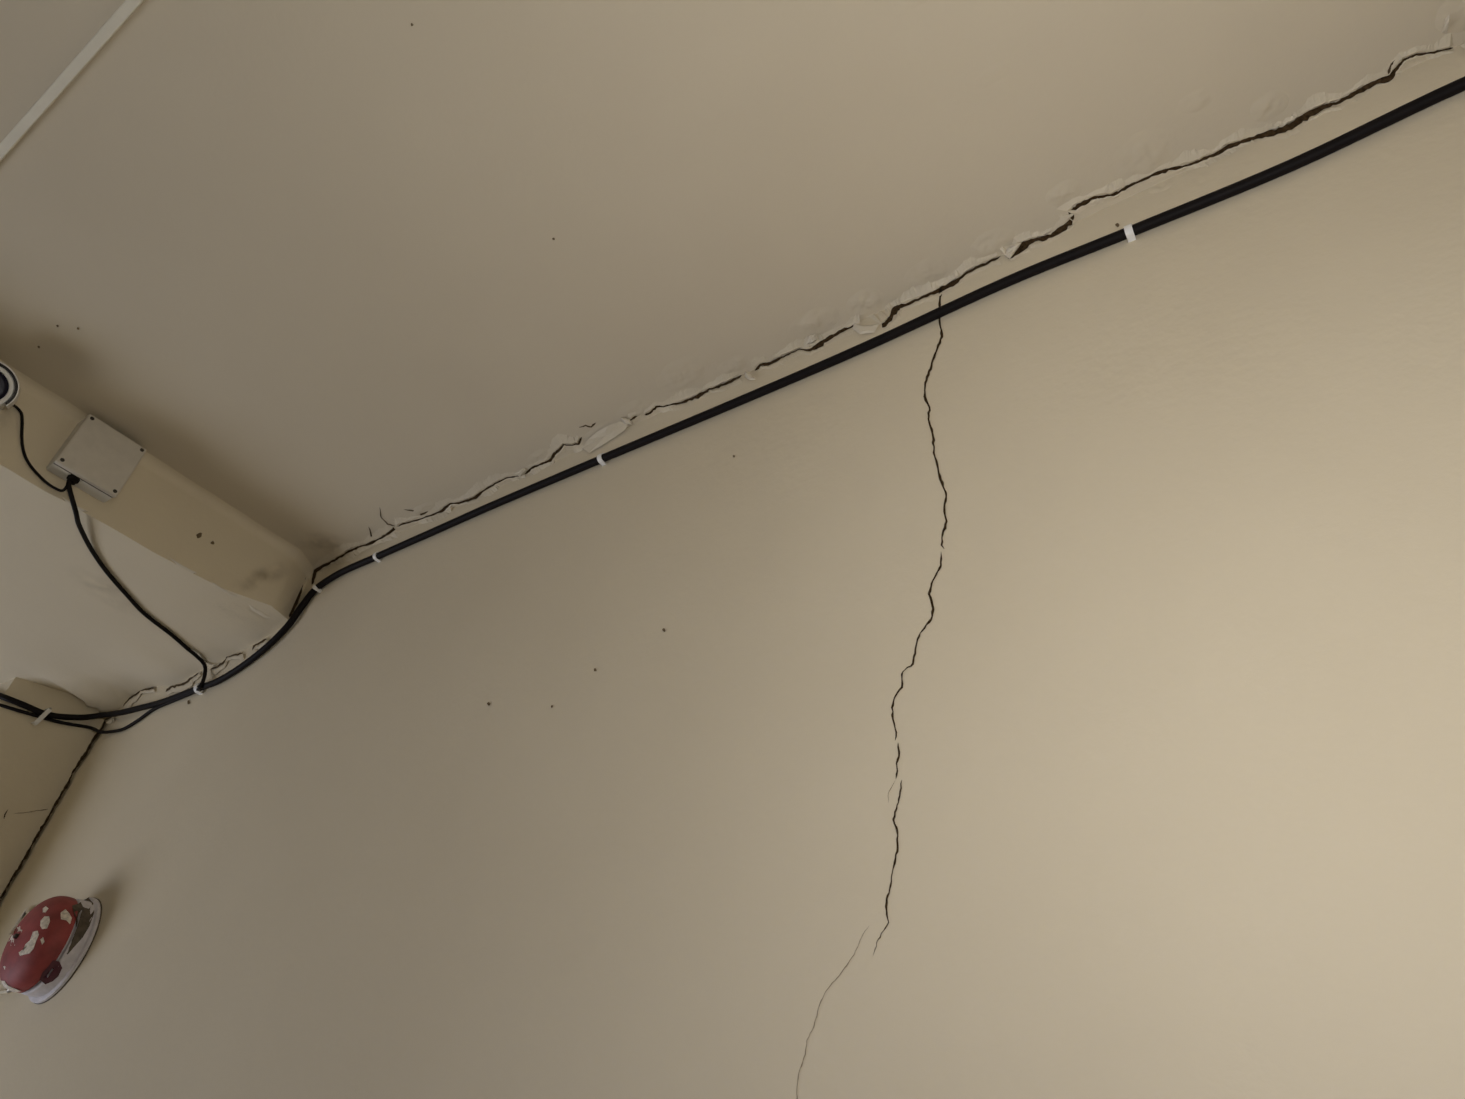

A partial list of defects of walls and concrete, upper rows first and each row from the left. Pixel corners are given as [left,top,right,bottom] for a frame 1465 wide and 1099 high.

crack [289,14,1465,1099]